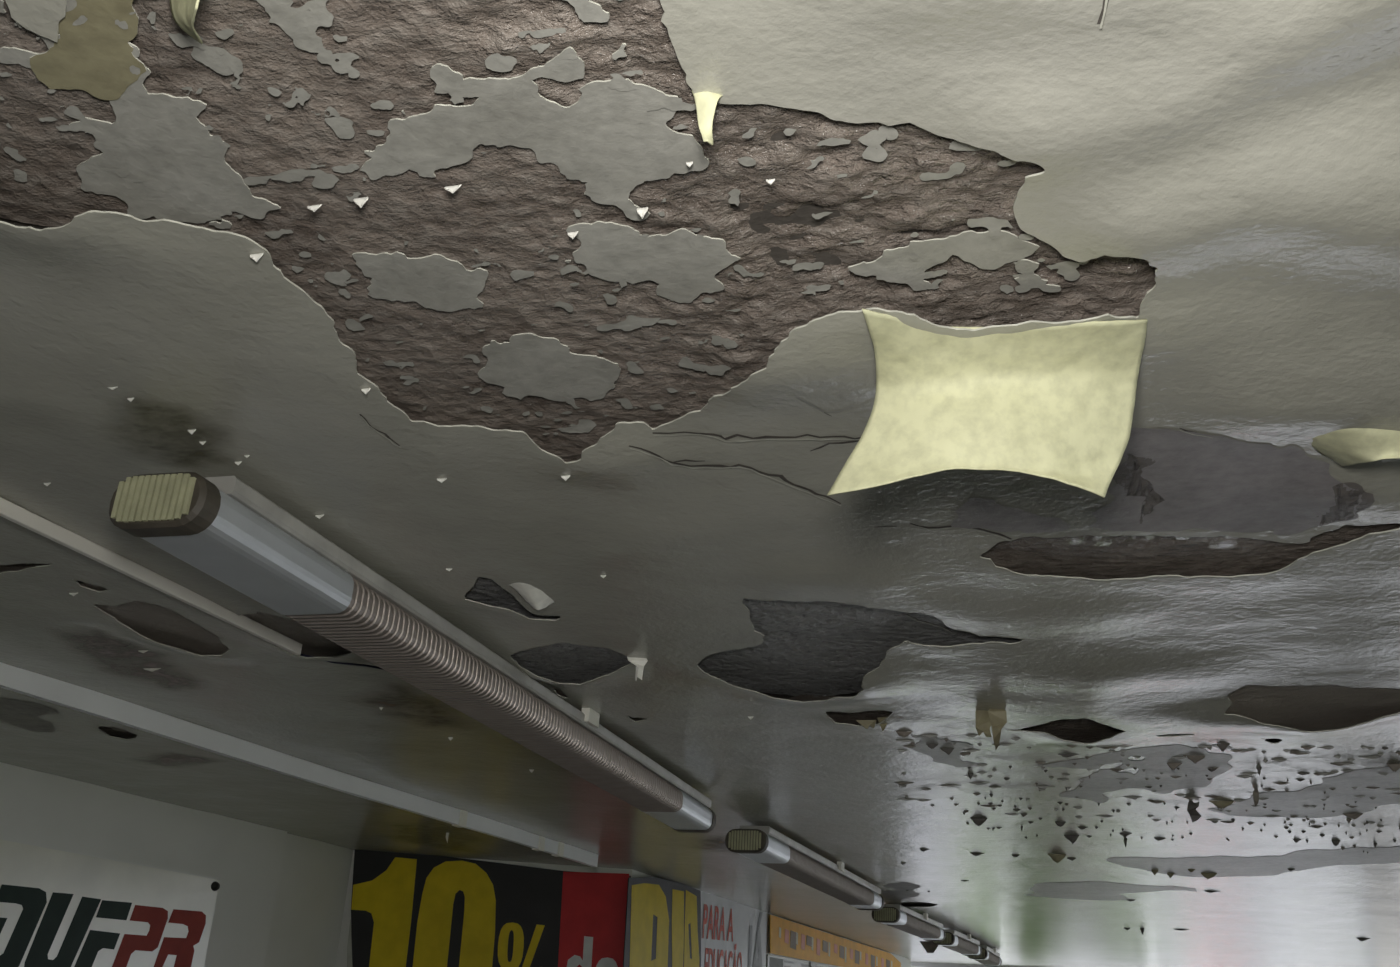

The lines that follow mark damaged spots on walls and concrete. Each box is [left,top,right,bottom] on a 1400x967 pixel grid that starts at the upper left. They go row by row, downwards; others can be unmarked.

crack [1097,0,1109,29]
peeling [0,0,1271,490]
peeling [971,427,1400,593]
peeling [69,582,368,672]
peeling [447,577,566,625]
peeling [496,598,1400,902]